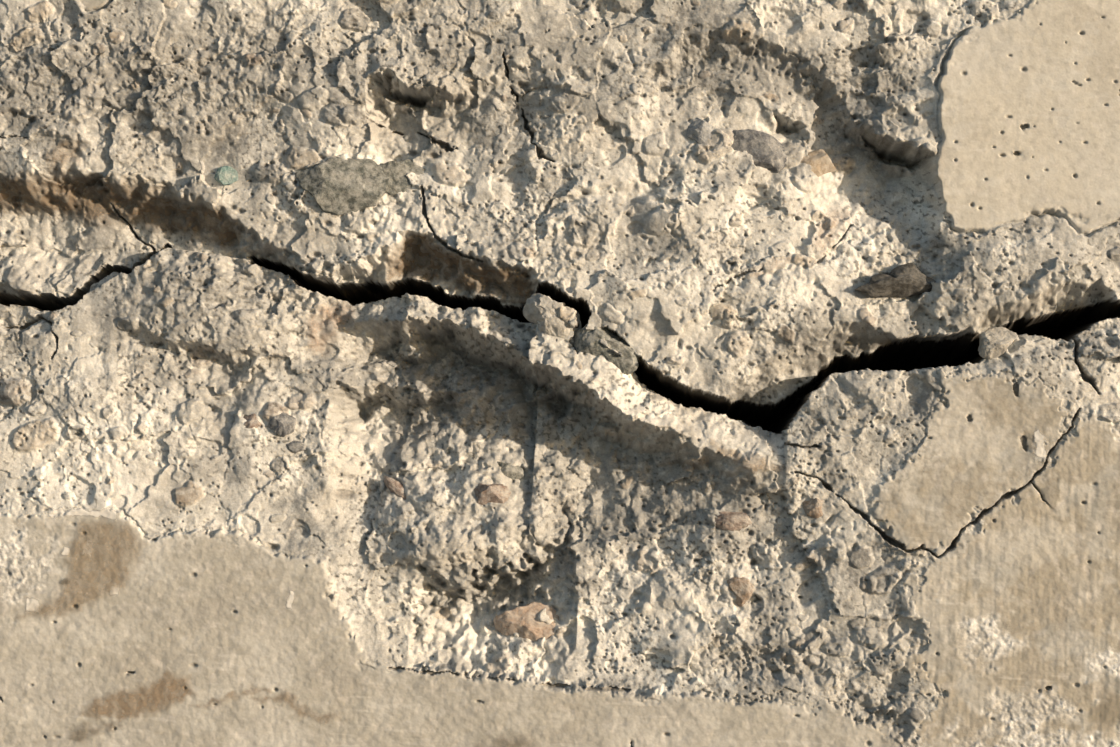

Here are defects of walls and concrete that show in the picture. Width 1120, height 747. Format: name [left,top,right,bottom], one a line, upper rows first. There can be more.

crack [0,203,172,360]
crack [420,186,484,263]
spalling [0,0,1120,405]
spalling [0,201,1120,747]
crack [248,256,1120,559]
crack [815,224,852,264]